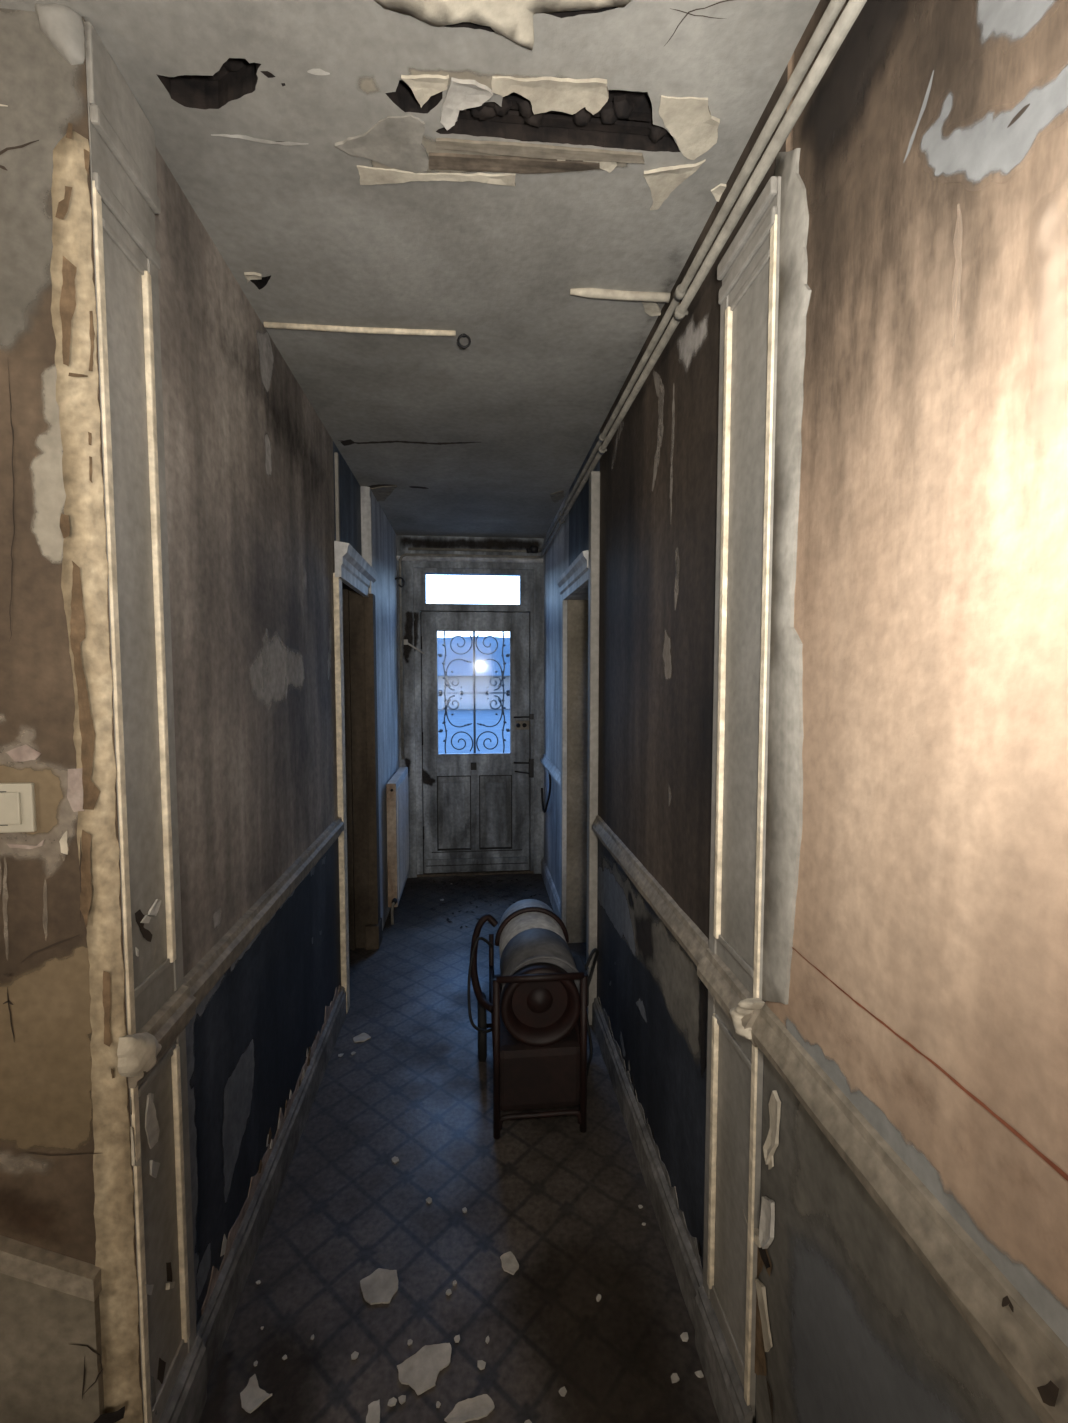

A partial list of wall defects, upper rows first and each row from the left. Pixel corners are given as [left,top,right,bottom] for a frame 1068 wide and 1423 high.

flaking render [375,0,631,50]
crack [664,0,732,46]
flaking render [156,58,285,109]
flaking render [335,69,720,210]
peeling [55,186,72,219]
flaking render [711,184,726,202]
peeling [60,256,95,377]
peeling [70,561,100,810]
peeling [135,899,161,956]
flaking render [763,1090,781,1170]
water stain [791,1100,1043,1423]
flaking render [743,1196,775,1419]